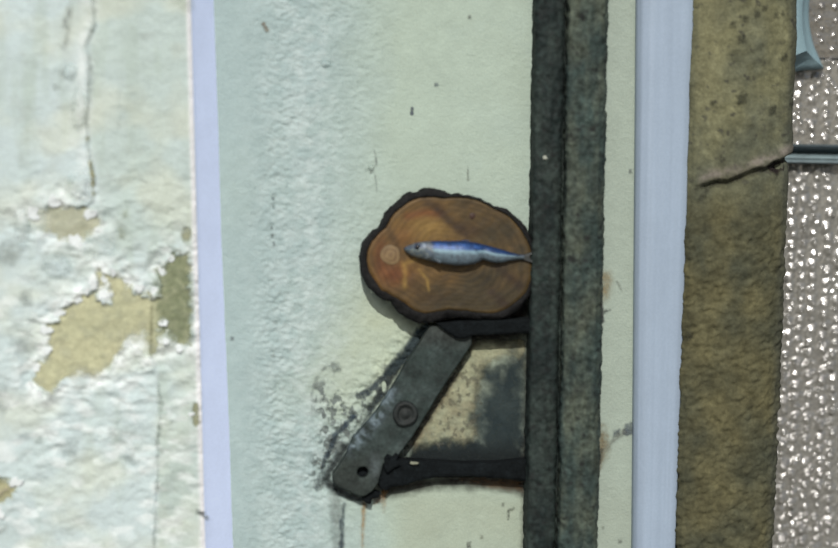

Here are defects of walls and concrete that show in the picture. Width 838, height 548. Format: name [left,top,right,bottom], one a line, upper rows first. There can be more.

crack [769,161,784,174]
peeling [27,194,99,249]
peeling [25,253,192,398]
peeling [0,476,24,520]